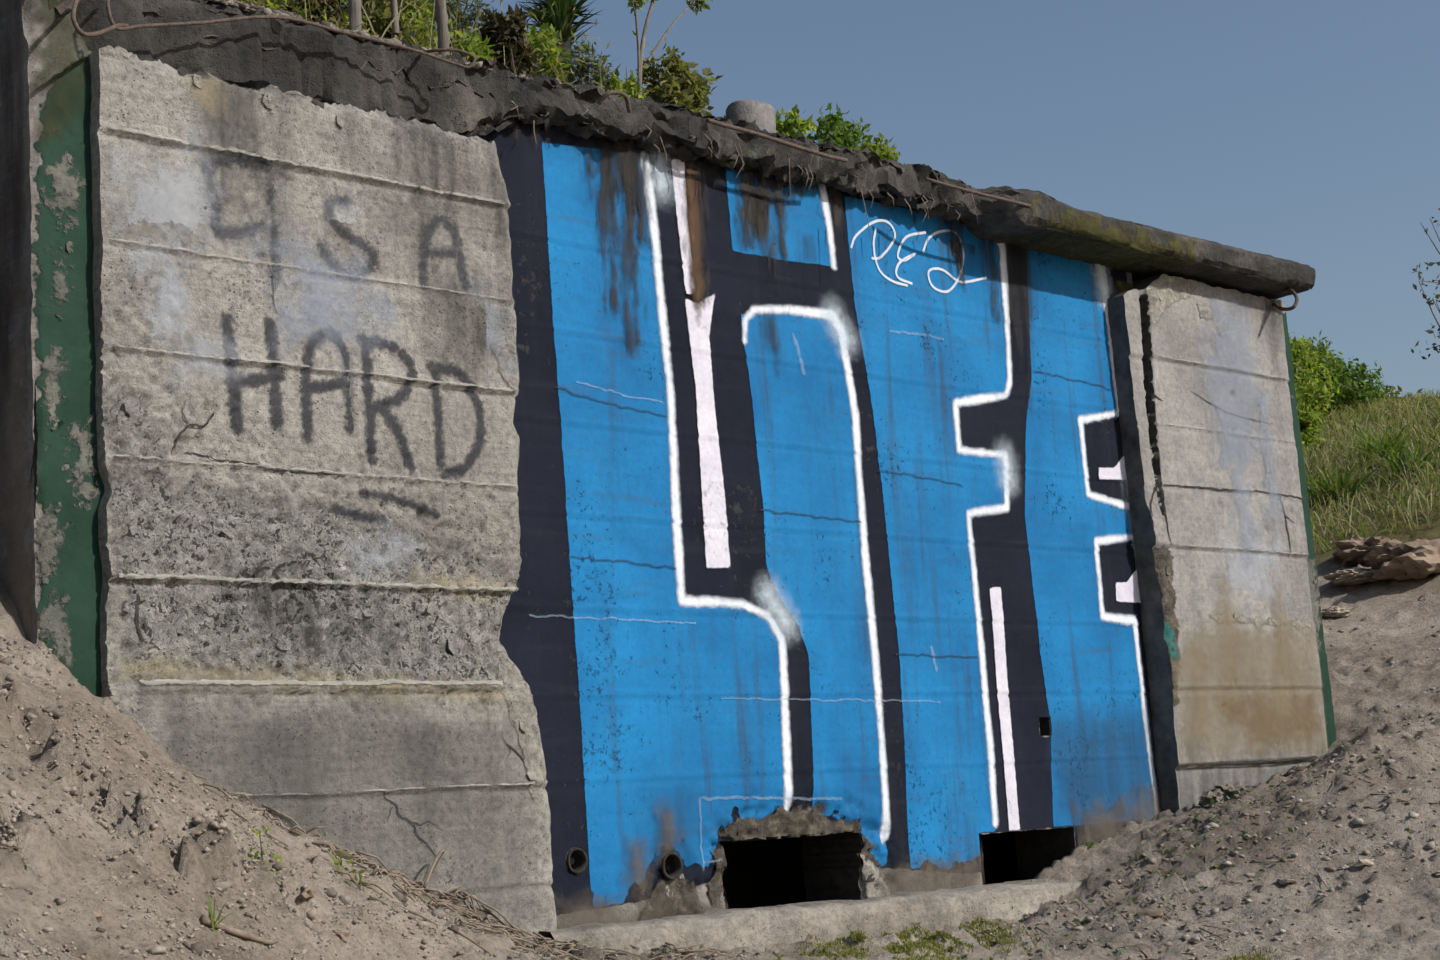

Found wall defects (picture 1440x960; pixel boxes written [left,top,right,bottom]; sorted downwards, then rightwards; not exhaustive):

peeling [40,153,87,320]
leakage [589,137,648,351]
leakage [735,168,861,272]
peeling [32,346,100,667]
crack [1036,294,1306,552]
crack [379,786,441,856]
spalling [641,803,891,921]